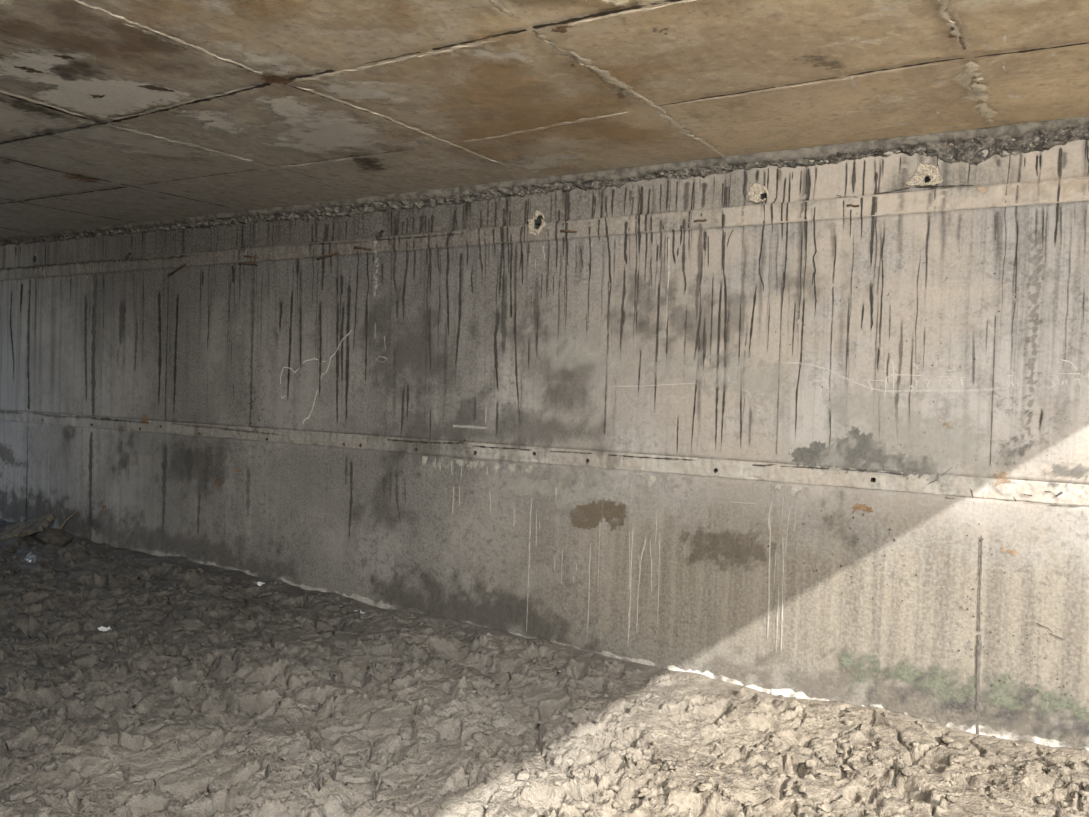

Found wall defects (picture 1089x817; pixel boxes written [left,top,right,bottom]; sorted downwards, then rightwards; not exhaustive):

peeling [256,96,416,153]
peeling [328,77,403,103]
spalling [0,125,1089,246]
leakage [279,166,830,447]
leakage [843,160,891,373]
leakage [909,225,929,414]
leakage [1002,155,1041,326]
leakage [1036,148,1062,243]
leakage [789,397,939,481]
leakage [372,456,628,653]
leakage [667,484,858,701]
leakage [862,673,1089,751]